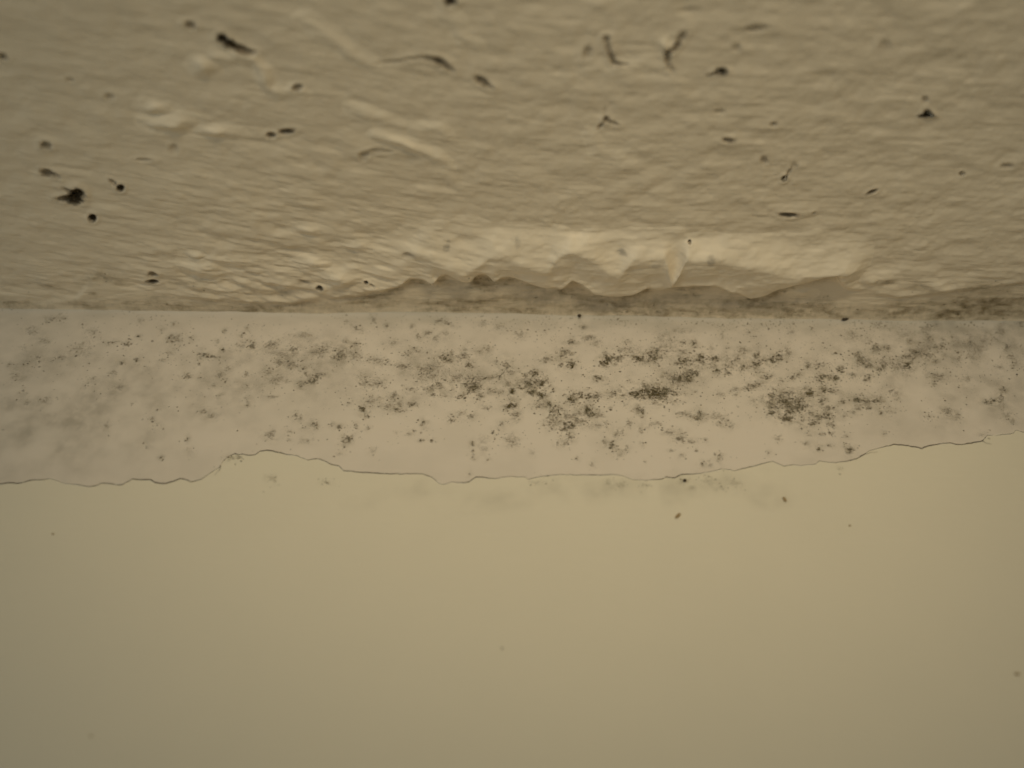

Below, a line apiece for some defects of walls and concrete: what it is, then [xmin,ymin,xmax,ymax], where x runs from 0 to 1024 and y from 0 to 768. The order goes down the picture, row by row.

leakage [561,341,667,417]